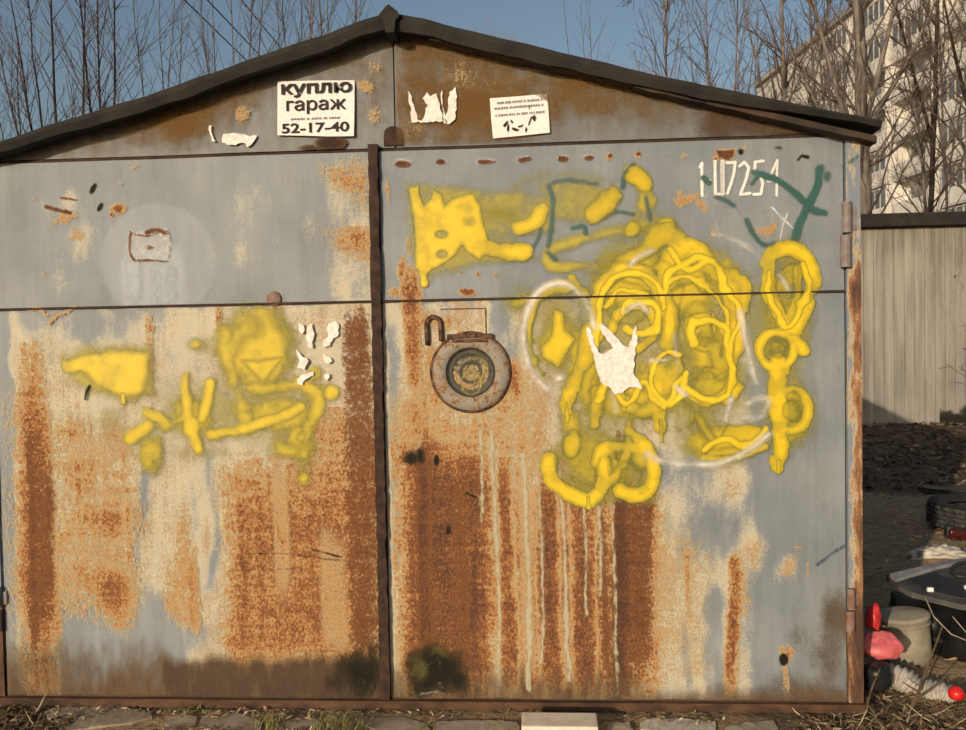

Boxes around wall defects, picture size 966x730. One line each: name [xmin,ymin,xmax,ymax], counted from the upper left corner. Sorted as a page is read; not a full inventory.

rust [1,337,150,696]
rust [144,312,154,409]
rust [161,304,379,665]
rust [299,136,369,211]
damp [7,428,661,701]
rust [317,221,371,266]
rust [388,235,714,699]
rust [723,541,760,696]